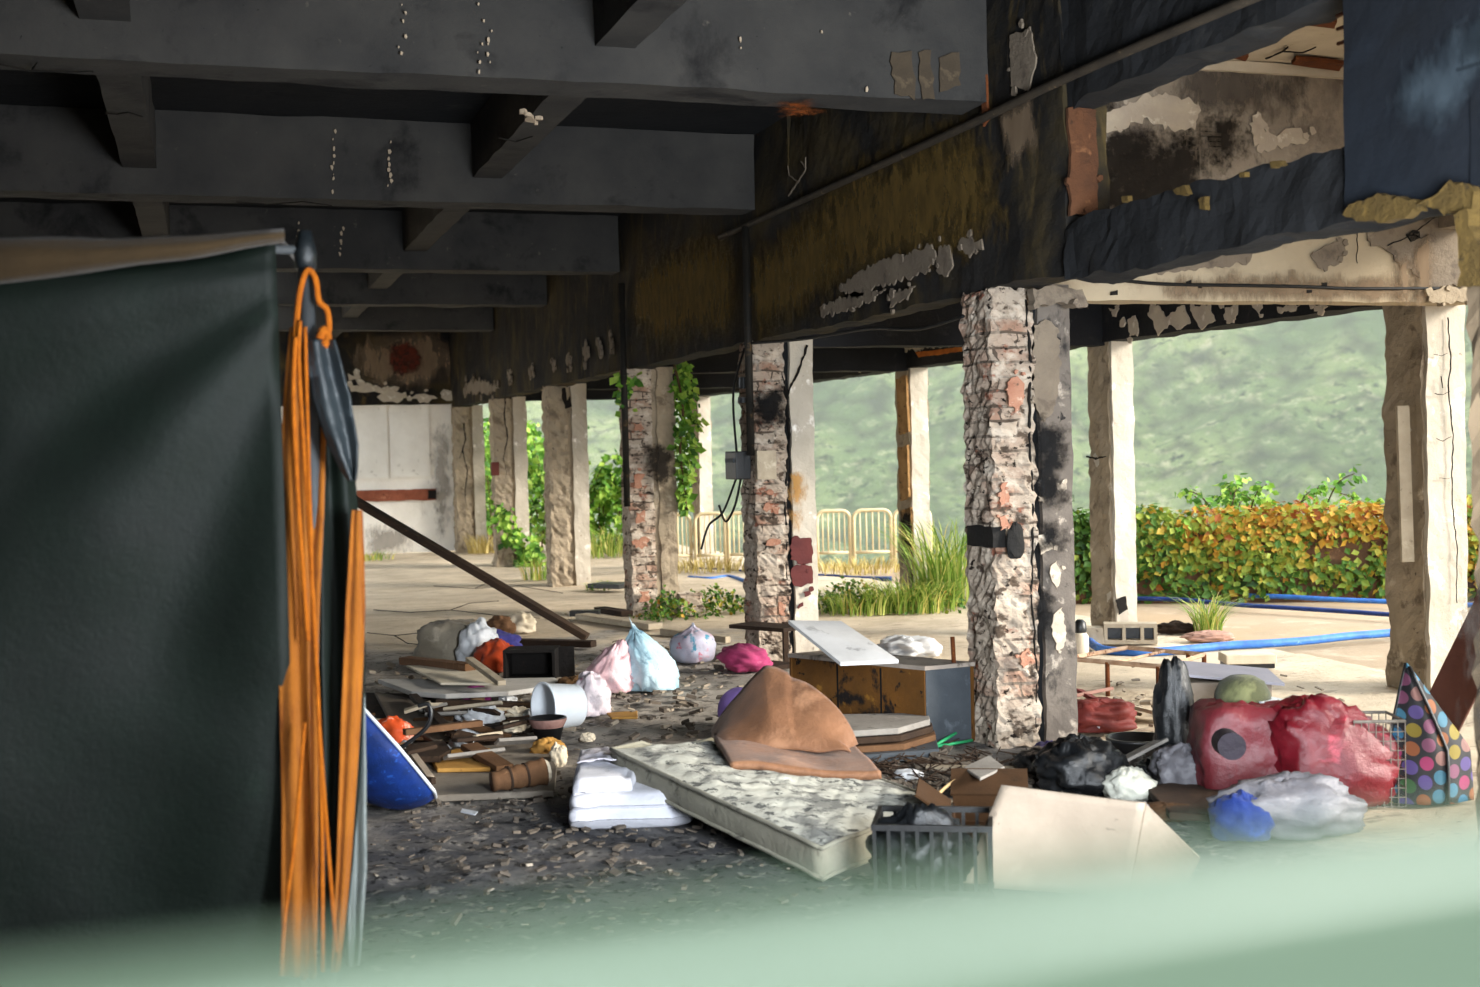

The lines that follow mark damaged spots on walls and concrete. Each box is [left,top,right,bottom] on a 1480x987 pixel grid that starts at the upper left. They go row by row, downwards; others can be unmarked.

spalling [1291,12,1344,71]
flaking render [1064,92,1201,217]
peeling [1249,111,1316,169]
spalling [1173,185,1210,210]
peeling [820,229,984,318]
peeling [1109,237,1349,344]
peeling [1343,179,1480,307]
peeling [347,329,615,409]
peeling [1005,285,1088,422]
flaking render [996,482,1010,531]
peeling [766,535,814,616]
flaking render [1014,648,1035,668]